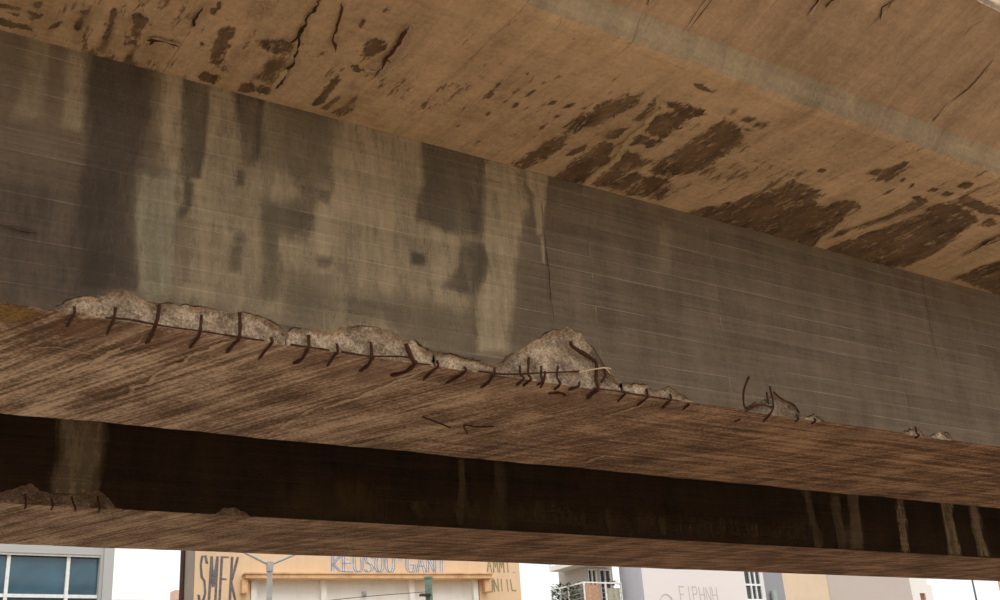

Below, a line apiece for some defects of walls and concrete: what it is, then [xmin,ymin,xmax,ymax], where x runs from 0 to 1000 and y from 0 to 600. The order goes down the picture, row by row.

crack [146,7,205,50]
crack [276,0,346,89]
crack [374,26,412,79]
crack [933,59,994,122]
water stain [0,50,548,352]
spalling [55,289,693,411]
spalling [734,376,824,424]